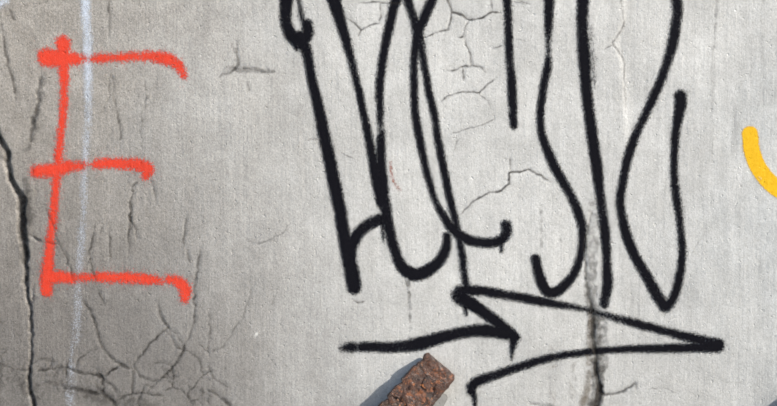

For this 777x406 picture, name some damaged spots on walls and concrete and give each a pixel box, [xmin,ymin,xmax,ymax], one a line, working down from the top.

crack [431,0,498,99]
crack [0,137,29,281]
crack [477,163,548,199]
crack [66,370,114,403]
rust [378,352,455,406]
crack [591,306,626,406]